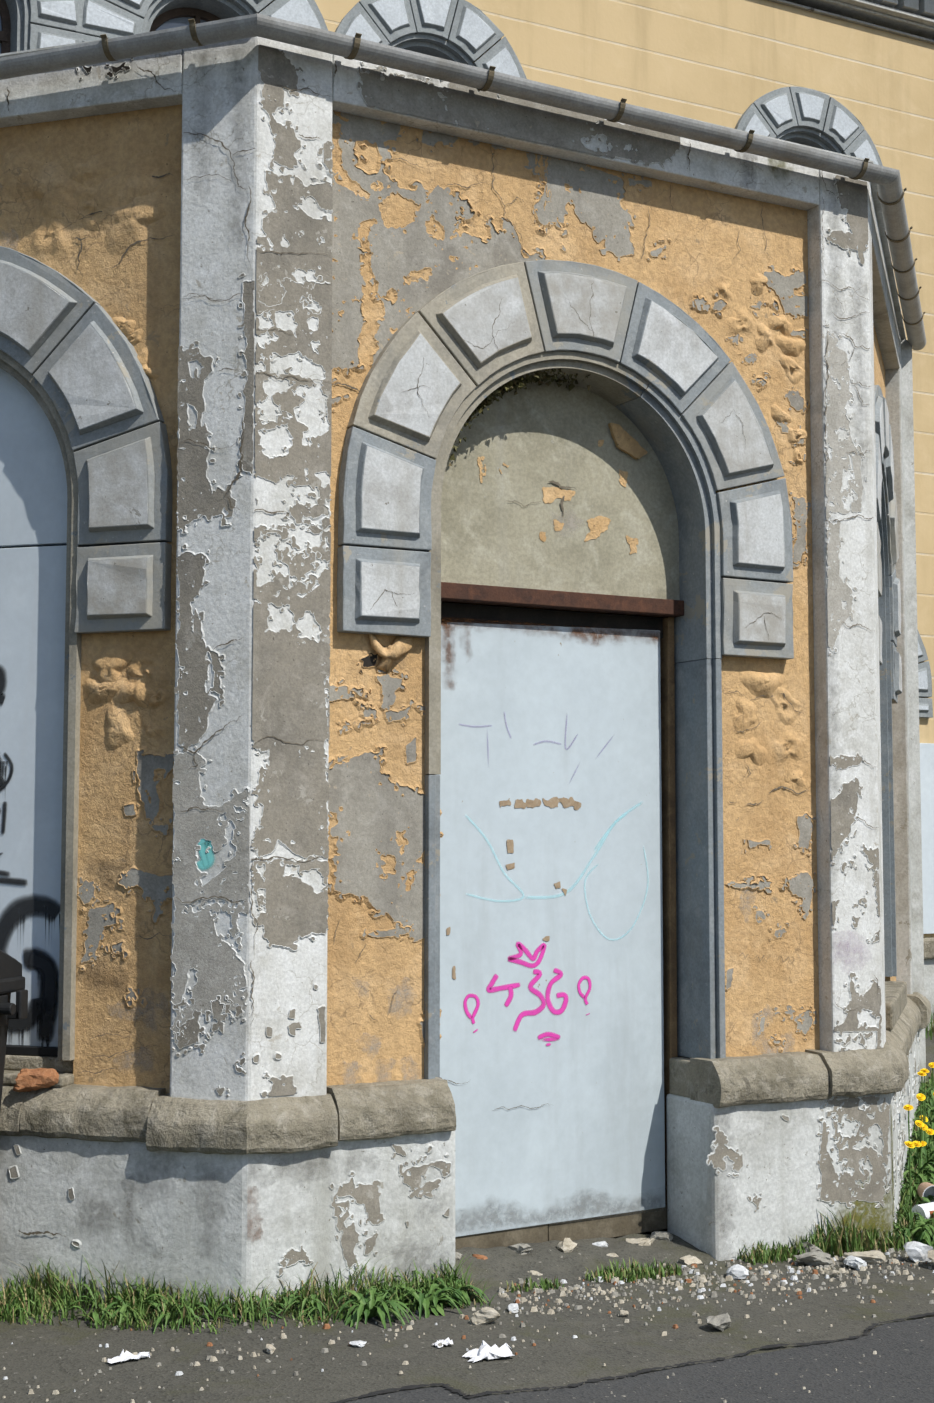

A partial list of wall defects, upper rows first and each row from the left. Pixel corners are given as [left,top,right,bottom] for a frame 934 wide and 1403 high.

crack [281,61,337,97]
crack [75,211,102,278]
crack [152,132,330,302]
crack [391,152,524,251]
crack [642,143,691,256]
peeling [825,175,868,266]
crack [219,368,360,392]
peeling [750,264,868,656]
peeling [75,45,681,1057]
peeling [834,971,882,1052]
spalling [329,1170,386,1271]
spalling [391,1143,452,1199]